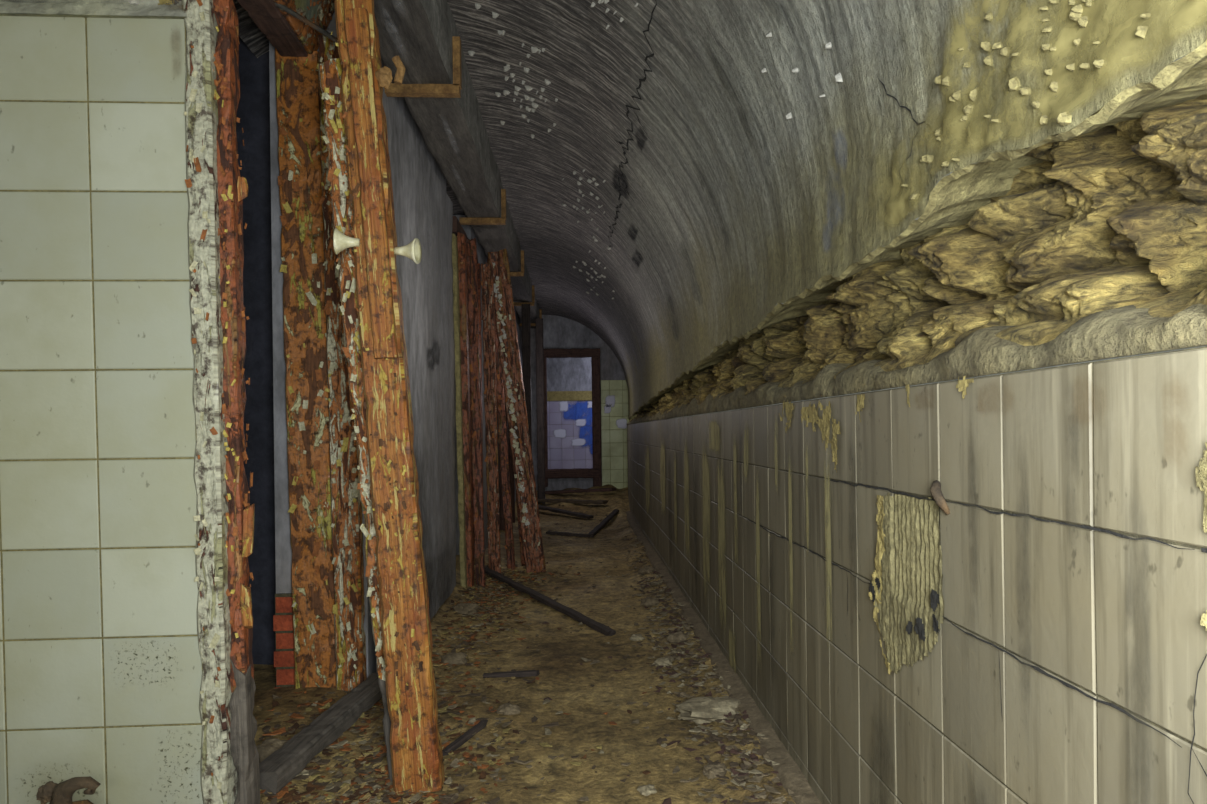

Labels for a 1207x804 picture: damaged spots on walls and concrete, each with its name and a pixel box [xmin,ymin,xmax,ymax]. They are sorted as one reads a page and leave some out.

flaking render [1039,0,1100,51]
flaking render [1135,13,1151,38]
peeling [184,37,244,213]
crack [605,0,657,253]
peeling [189,211,249,373]
peeling [288,0,423,691]
spalling [604,40,1207,472]
peeling [198,366,253,552]
crack [745,517,870,613]
spalling [868,480,950,674]
crack [822,477,1195,550]
crack [942,616,1207,804]